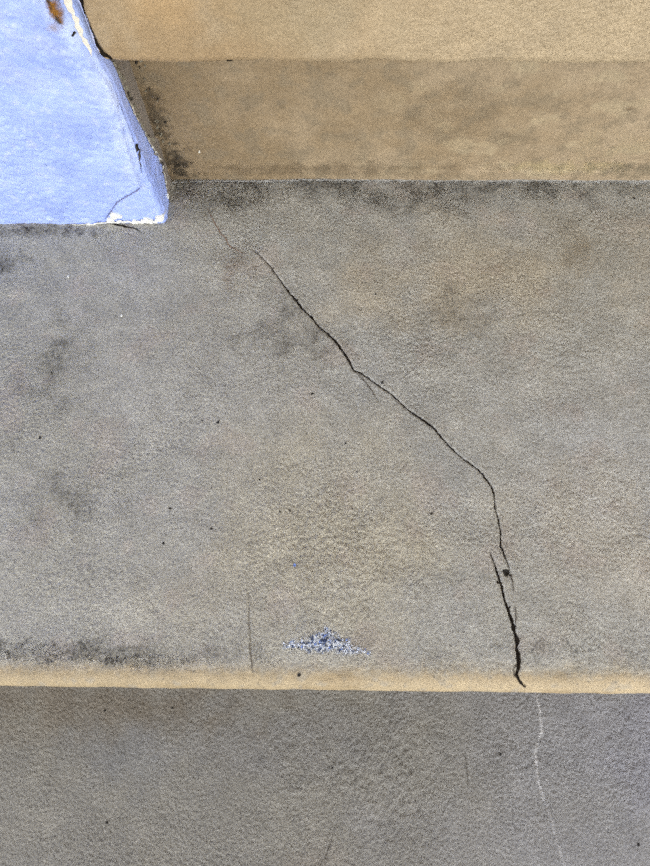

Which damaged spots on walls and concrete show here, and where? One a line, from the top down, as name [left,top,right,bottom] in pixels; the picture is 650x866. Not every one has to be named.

peeling [283,626,371,654]
crack [207,207,526,688]